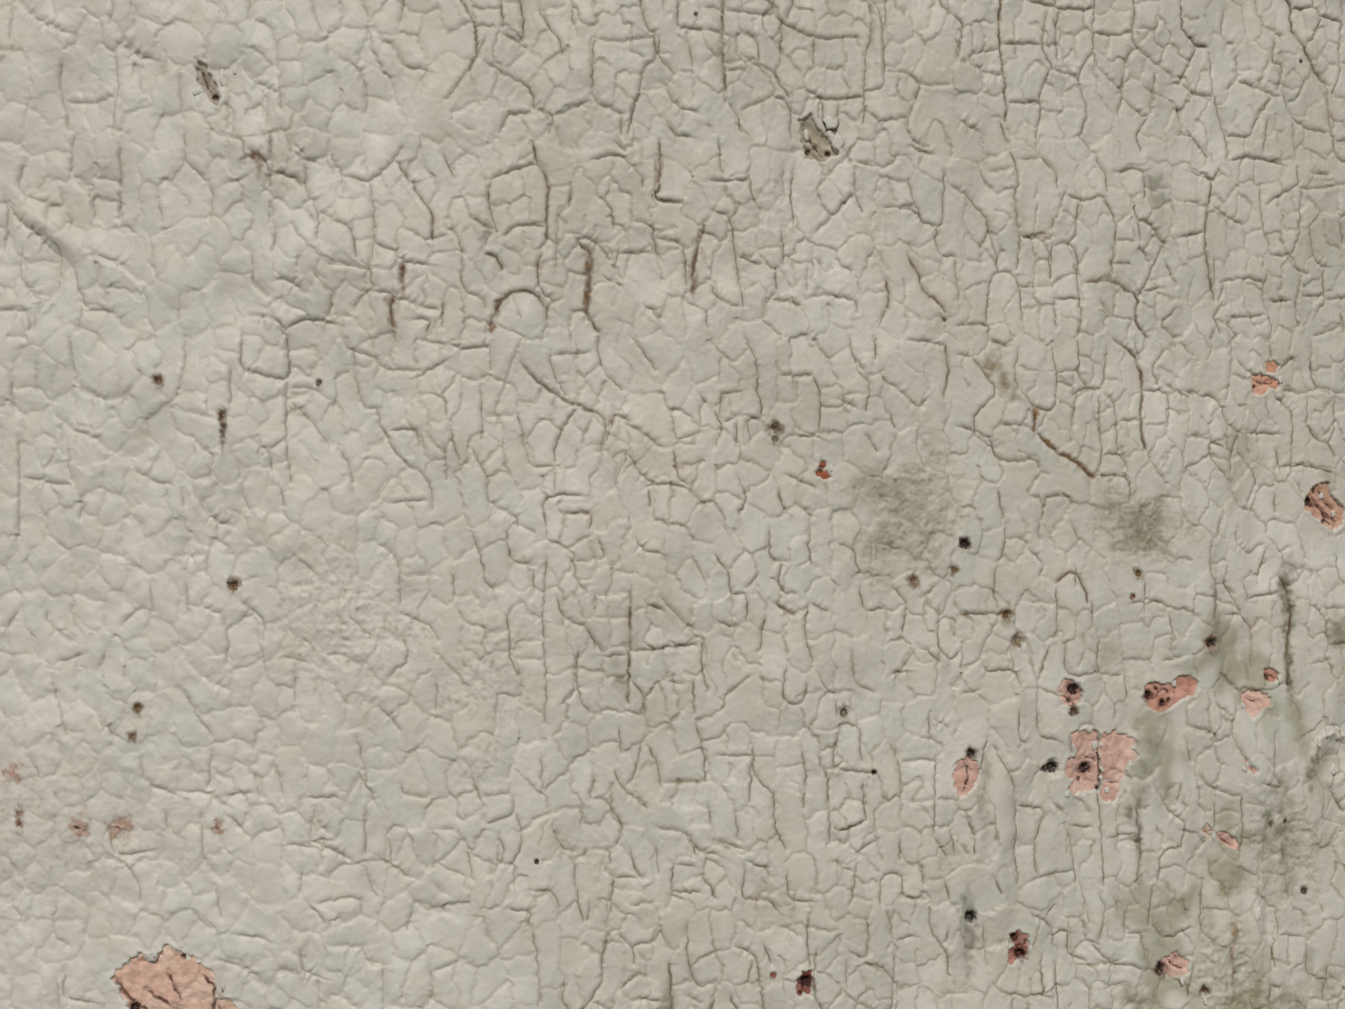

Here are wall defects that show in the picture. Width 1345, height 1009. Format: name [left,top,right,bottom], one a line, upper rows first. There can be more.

peeling [1252,361,1283,395]
peeling [1304,482,1343,531]
peeling [1057,679,1085,715]
peeling [1143,676,1197,713]
peeling [1241,668,1282,718]
peeling [952,747,979,796]
peeling [1064,730,1137,803]
peeling [112,944,236,1009]
peeling [1005,930,1028,965]
peeling [1155,951,1188,986]